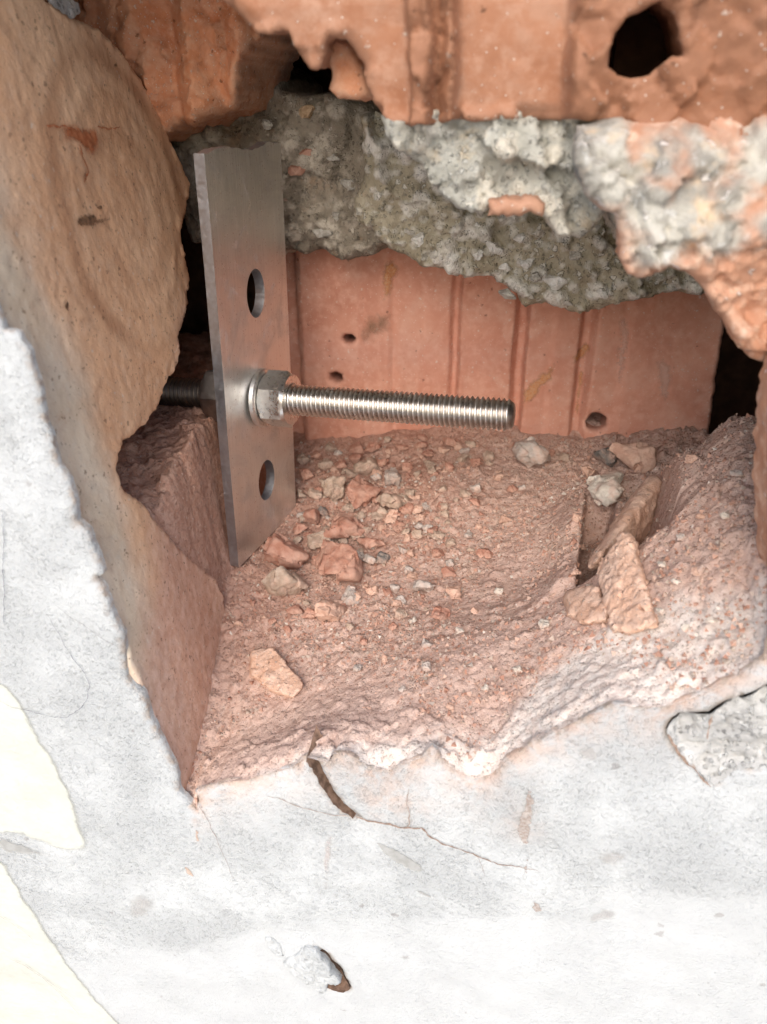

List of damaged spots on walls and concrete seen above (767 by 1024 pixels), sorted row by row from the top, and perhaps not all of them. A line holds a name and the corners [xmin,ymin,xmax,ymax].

spalling [667,685,767,785]
crack [268,725,534,870]
flaking render [265,937,350,994]